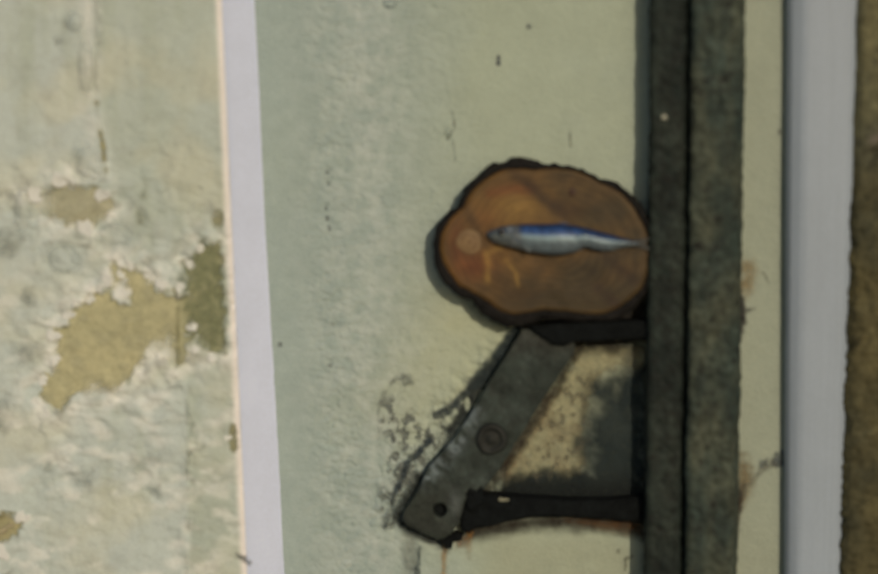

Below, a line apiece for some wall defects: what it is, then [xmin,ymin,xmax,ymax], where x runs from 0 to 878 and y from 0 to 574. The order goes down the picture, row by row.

peeling [27,172,113,236]
peeling [30,241,227,417]
peeling [0,510,31,561]